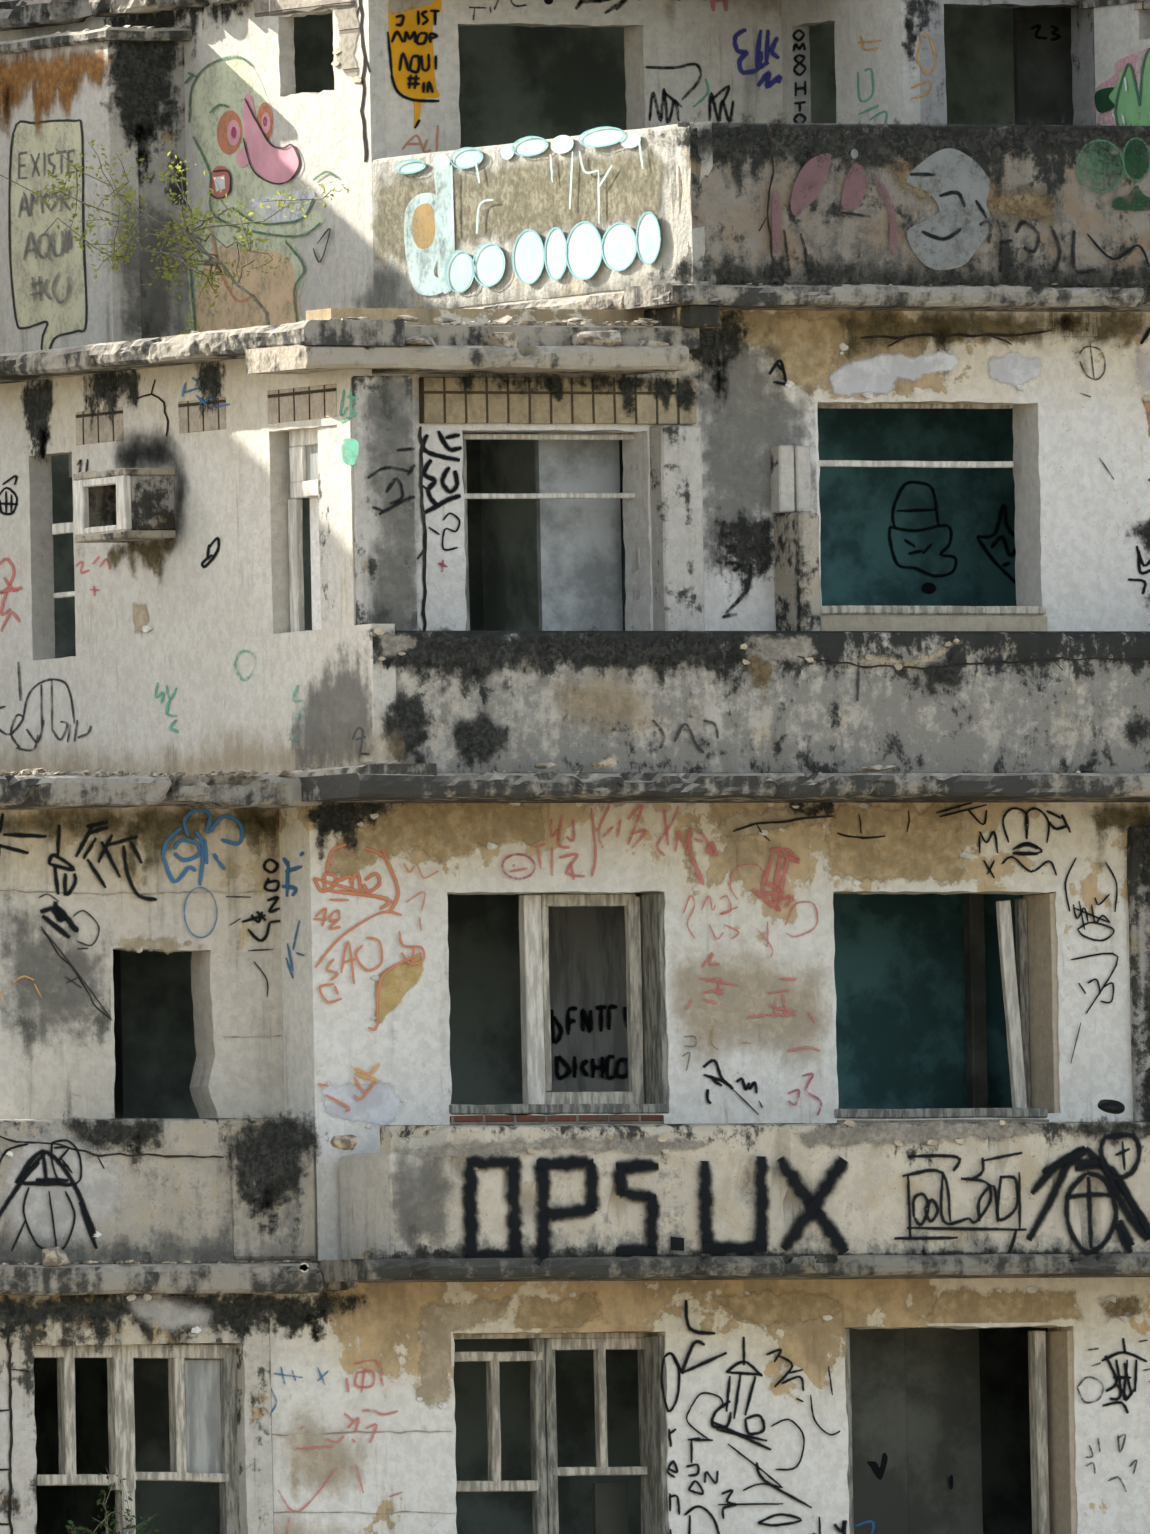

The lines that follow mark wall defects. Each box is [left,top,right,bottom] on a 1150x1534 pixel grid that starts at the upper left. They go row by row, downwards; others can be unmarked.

rust [0,50,108,131]
damp [100,2,248,175]
damp [649,113,1150,198]
peeling [717,310,849,394]
peeling [1137,353,1150,436]
damp [291,610,773,768]
damp [925,655,969,695]
damp [1125,715,1150,747]
damp [228,1110,329,1234]
peeling [416,1292,607,1409]
peeling [712,1289,841,1330]